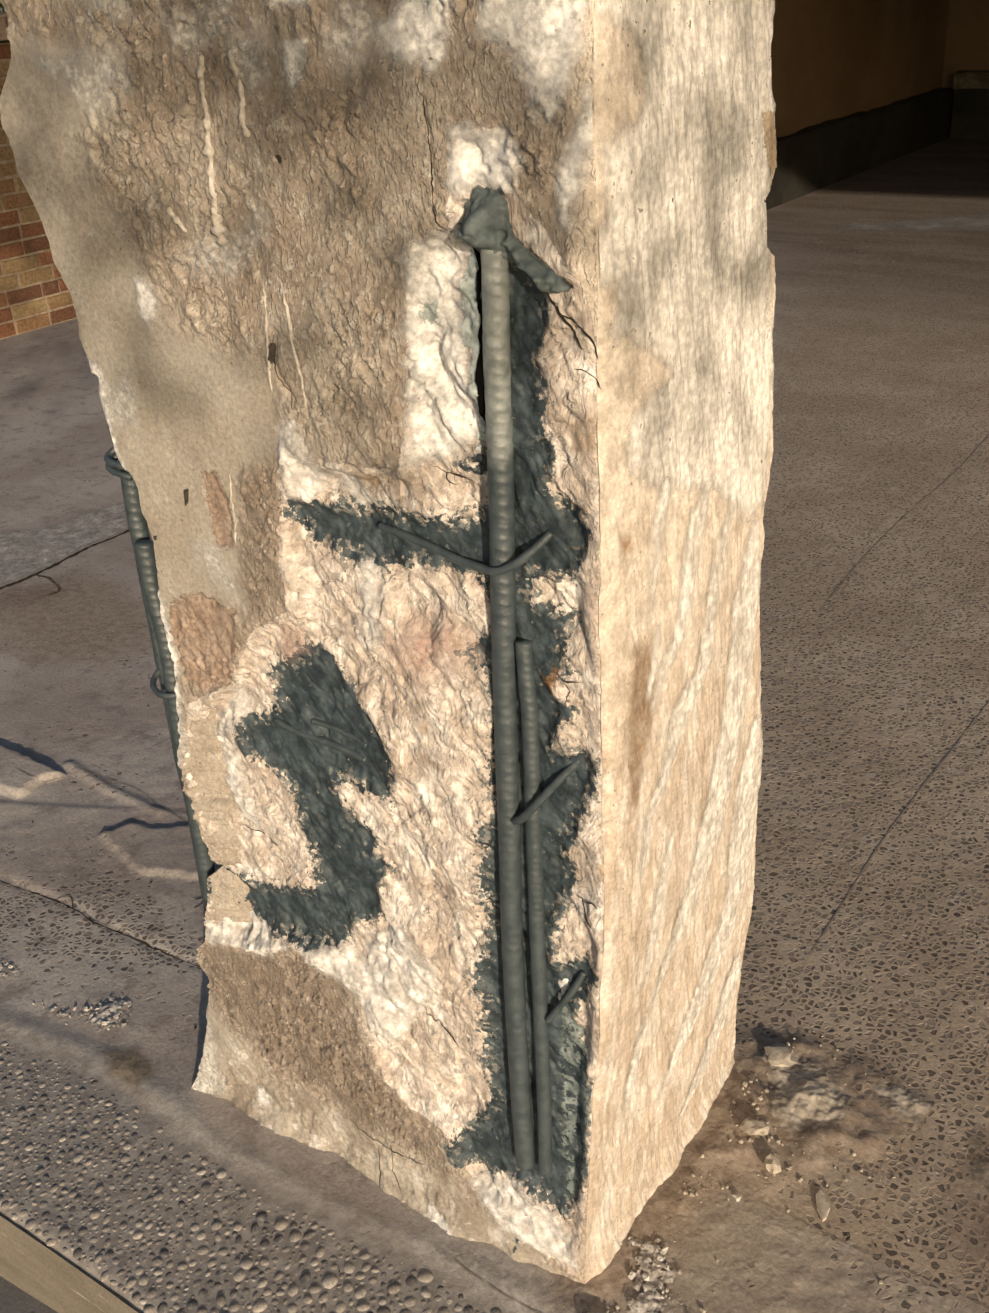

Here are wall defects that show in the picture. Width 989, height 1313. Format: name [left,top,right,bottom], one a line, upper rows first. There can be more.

crack [545,287,601,389]
crack [0,513,129,597]
spalling [89,0,777,1279]